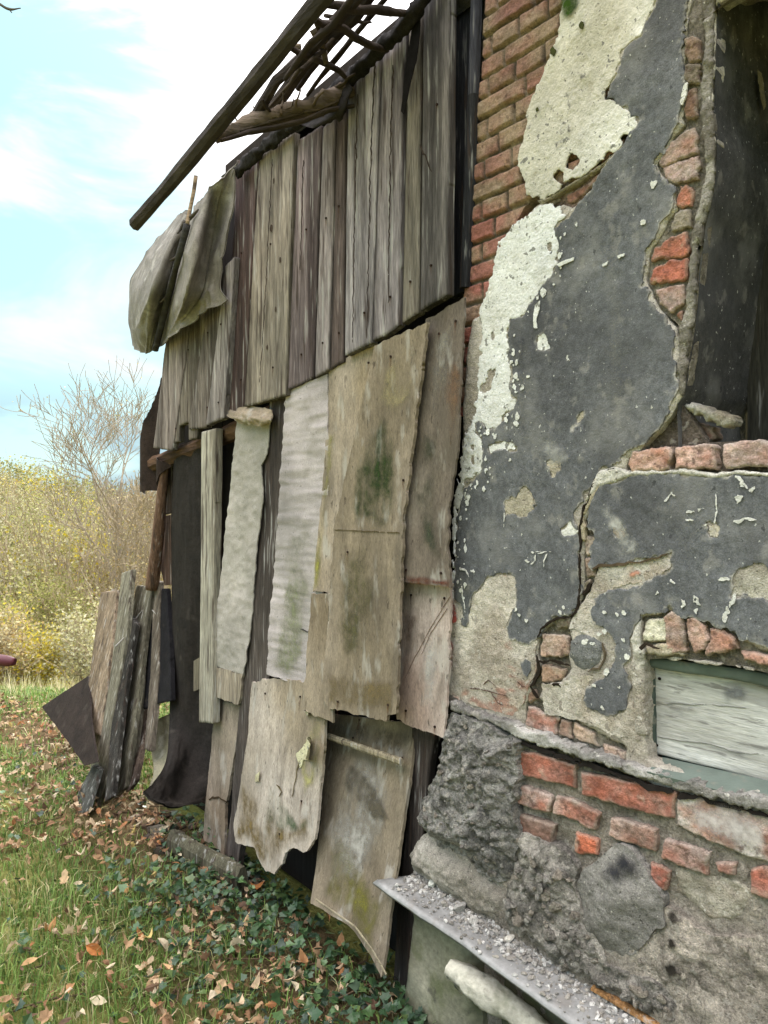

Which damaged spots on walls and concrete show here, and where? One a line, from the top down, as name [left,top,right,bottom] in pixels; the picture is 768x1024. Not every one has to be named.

leakage [356,431,392,515]
flaking render [449,0,768,740]
crack [509,468,768,817]
spalling [518,751,768,899]